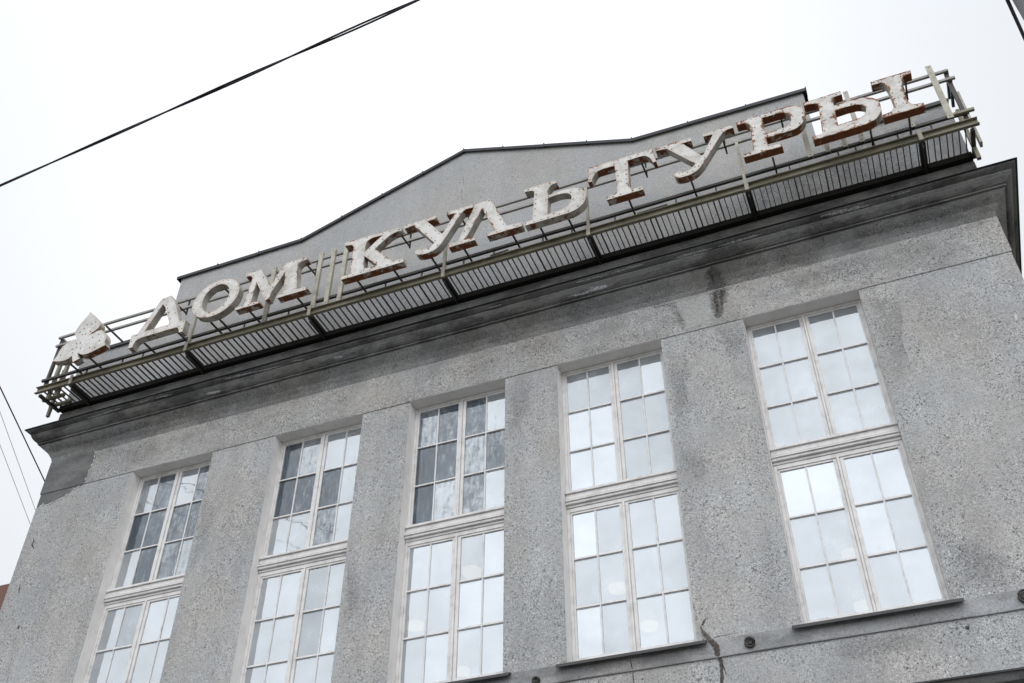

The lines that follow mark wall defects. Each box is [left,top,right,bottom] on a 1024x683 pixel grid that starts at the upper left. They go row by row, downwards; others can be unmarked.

water stain [706,267,726,316]
crack [700,619,739,683]